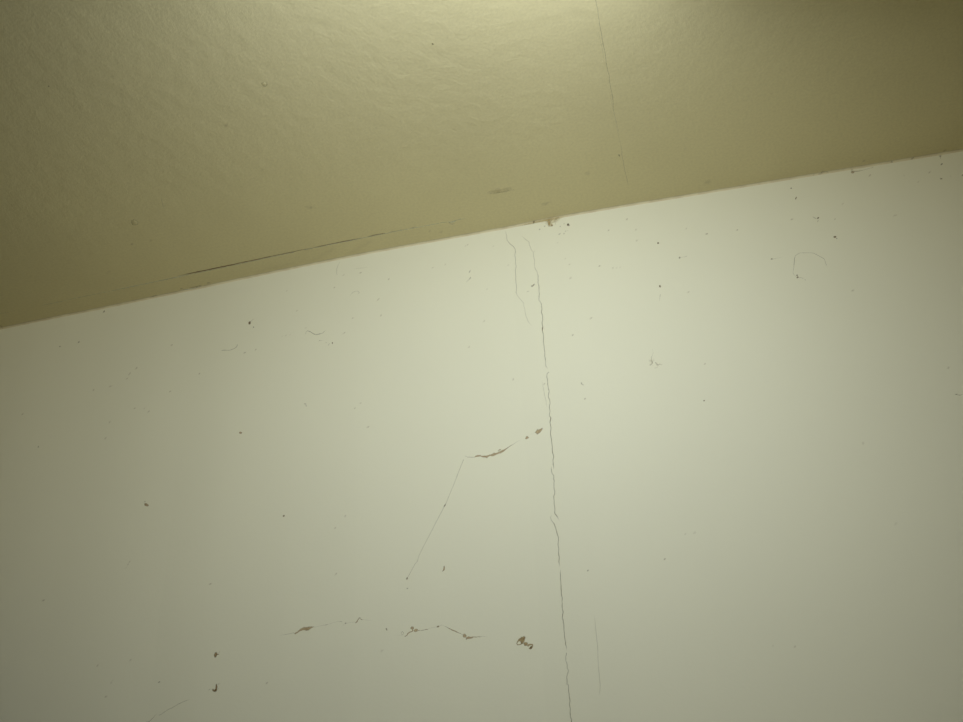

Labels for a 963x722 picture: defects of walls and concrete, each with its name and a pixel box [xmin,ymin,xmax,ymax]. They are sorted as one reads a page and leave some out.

crack [132,221,455,287]
crack [475,294,572,722]
crack [386,626,473,639]